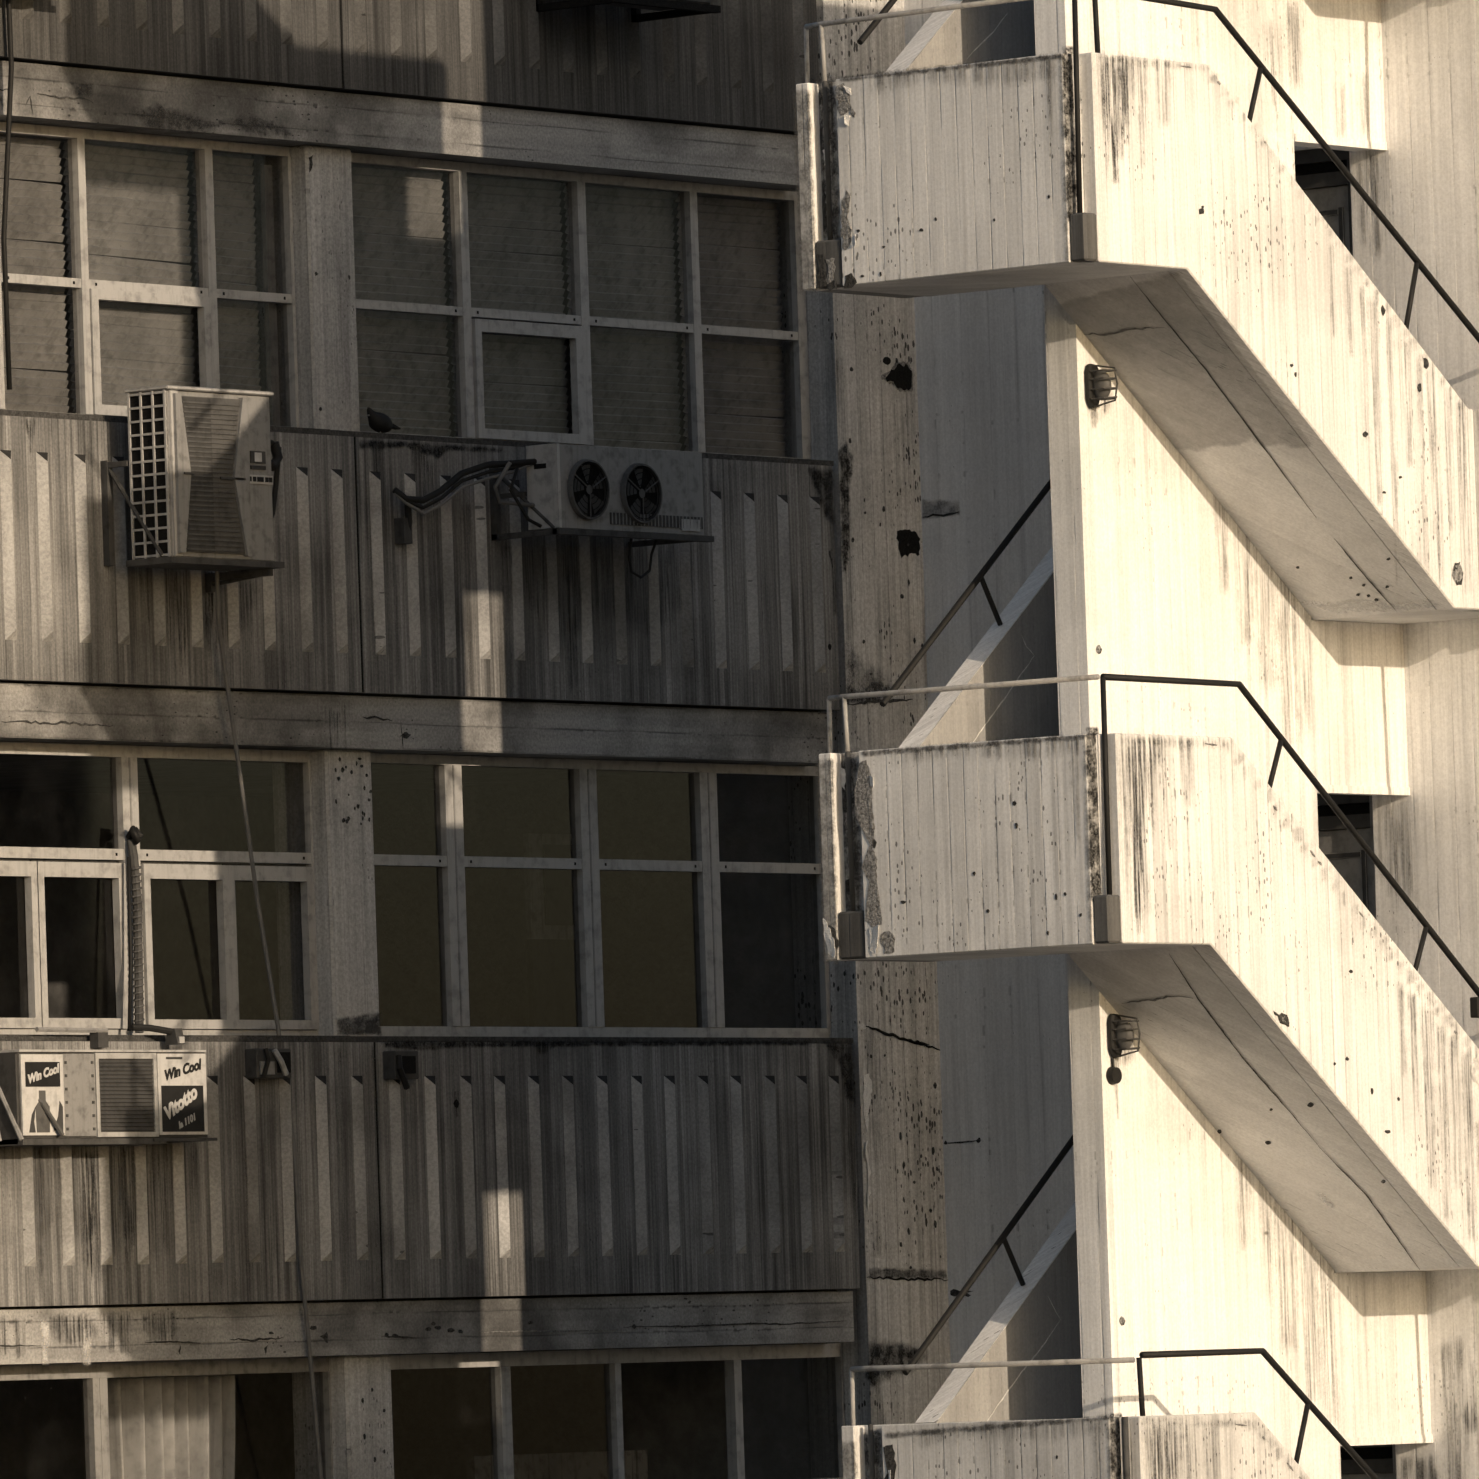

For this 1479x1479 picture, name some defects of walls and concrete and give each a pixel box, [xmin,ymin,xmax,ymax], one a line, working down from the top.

peeling [819,83,855,166]
damp [1101,58,1132,180]
peeling [816,190,882,291]
spalling [880,357,914,392]
damp [810,445,853,612]
spalling [864,498,920,558]
peeling [840,760,895,954]
crack [858,1022,940,1050]
peeling [883,1444,897,1479]